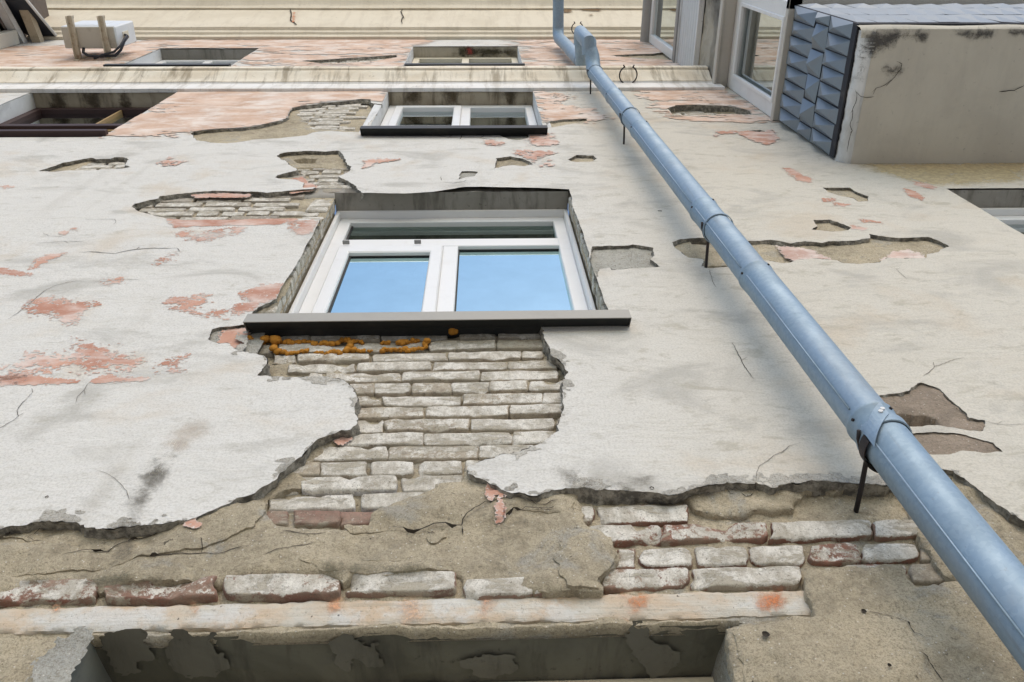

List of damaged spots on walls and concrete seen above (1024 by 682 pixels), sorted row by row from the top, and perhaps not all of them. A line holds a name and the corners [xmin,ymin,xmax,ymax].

damp [860,30,927,71]
damp [960,30,994,38]
peeling [93,91,386,143]
crack [847,61,902,150]
spalling [40,157,129,172]
spalling [132,151,400,243]
spalling [586,244,660,283]
spalling [672,238,728,268]
spalling [748,218,950,264]
spalling [0,278,1024,682]
crack [392,496,554,534]
crack [65,533,241,557]